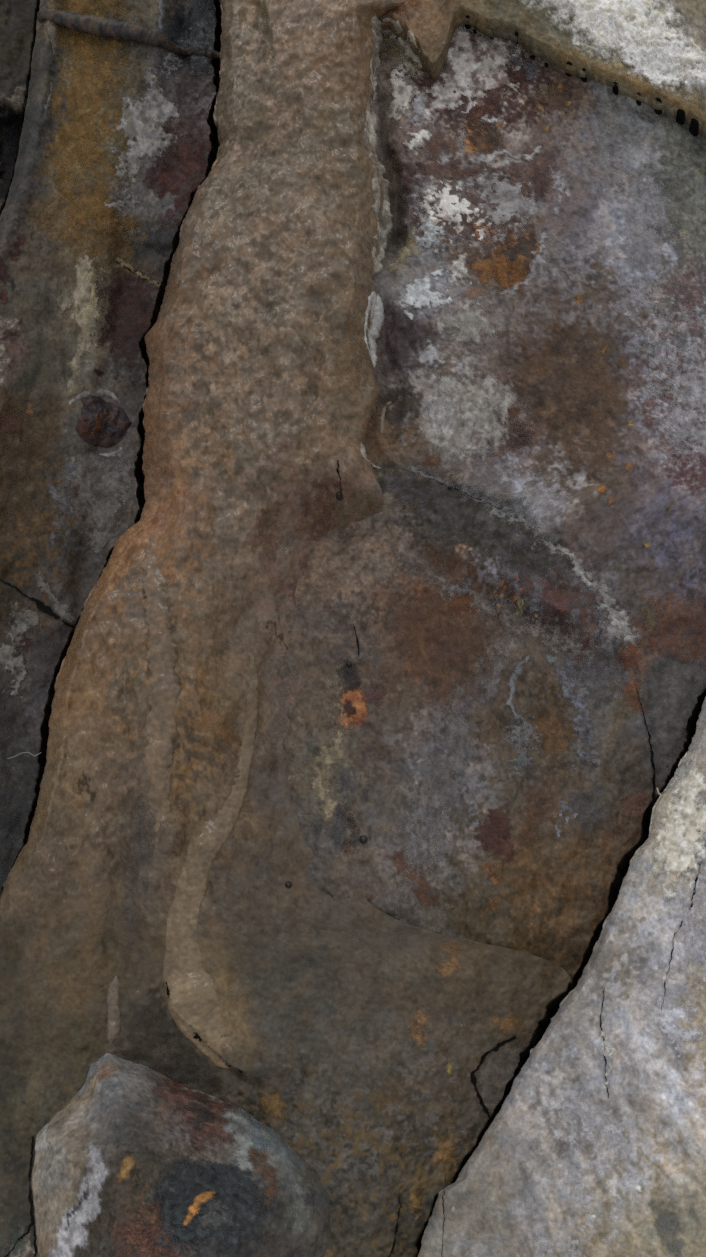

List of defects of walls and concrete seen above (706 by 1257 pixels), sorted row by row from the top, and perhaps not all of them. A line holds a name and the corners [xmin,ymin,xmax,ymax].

damp [105,0,217,218]
peeling [363,15,422,275]
damp [530,0,706,91]
crack [115,0,222,524]
peeling [364,291,385,367]
corrosion [464,229,547,297]
corrosion [59,523,150,681]
crack [0,579,79,846]
damp [311,730,371,850]
damp [386,547,639,932]
crack [388,689,706,1257]
corrosion [125,1064,286,1257]